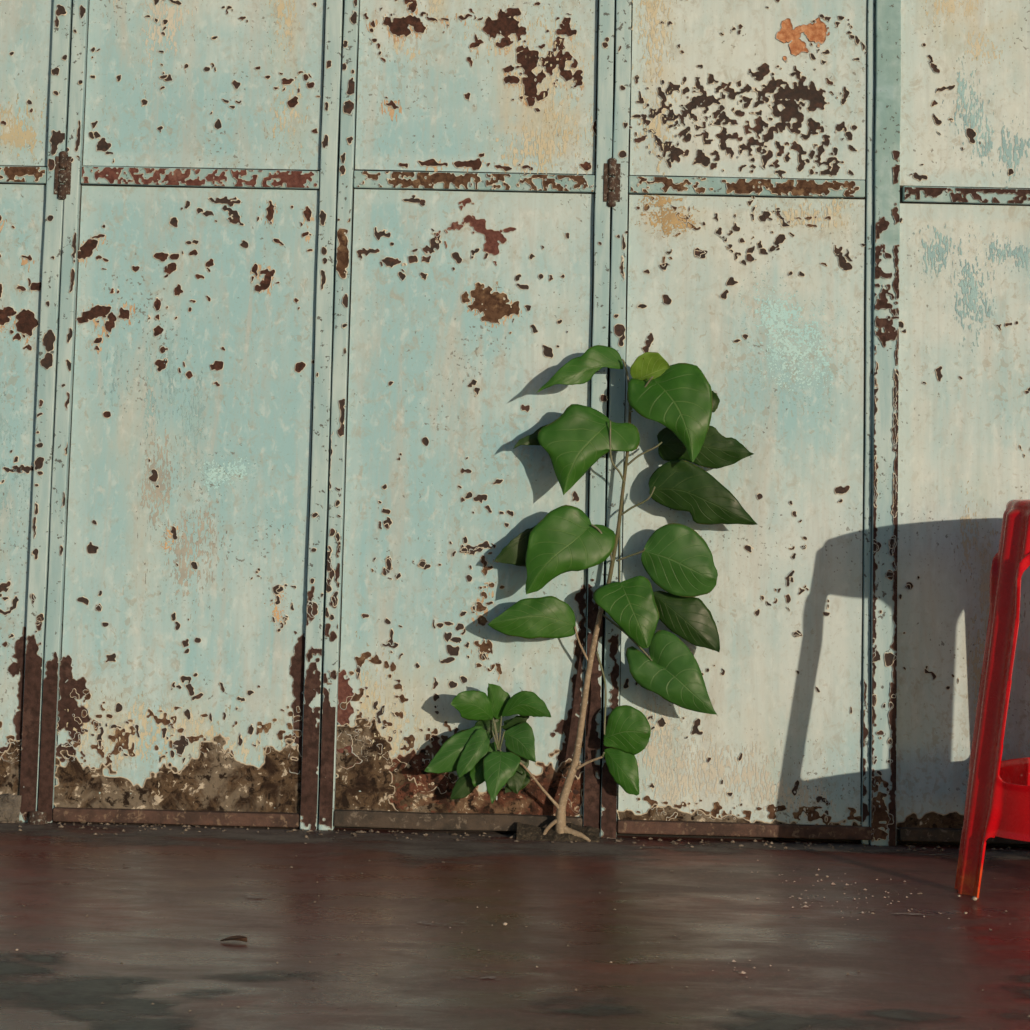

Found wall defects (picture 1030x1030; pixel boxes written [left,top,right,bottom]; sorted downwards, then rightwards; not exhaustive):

rust [54,4,86,33]
rust [326,60,355,115]
rust [0,120,318,188]
rust [339,136,353,176]
rust [350,0,622,266]
rust [616,0,863,282]
rust [0,150,1030,847]